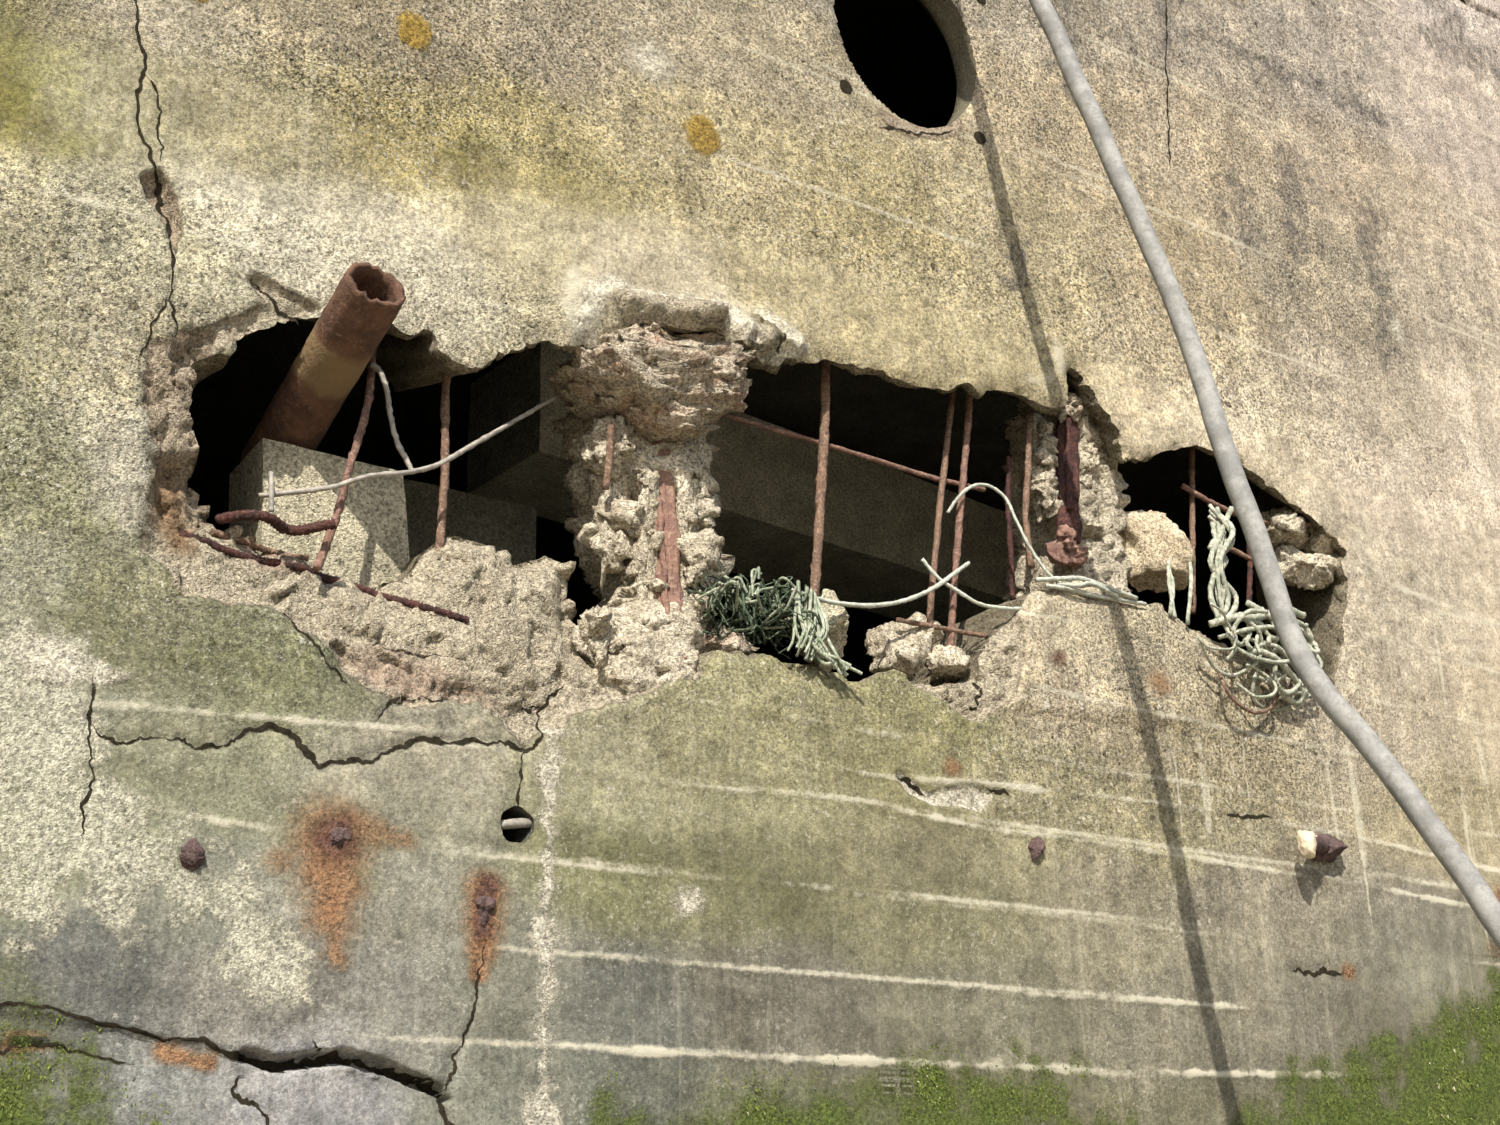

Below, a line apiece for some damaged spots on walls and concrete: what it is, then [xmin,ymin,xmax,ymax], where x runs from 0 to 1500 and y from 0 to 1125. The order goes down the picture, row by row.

crack [134,0,178,362]
spalling [140,272,666,746]
crack [277,611,440,689]
spalling [909,612,1025,722]
crack [80,671,565,841]
spalling [897,773,993,811]
corrosion [296,803,411,965]
corrosion [466,874,503,981]
crack [0,945,485,1125]